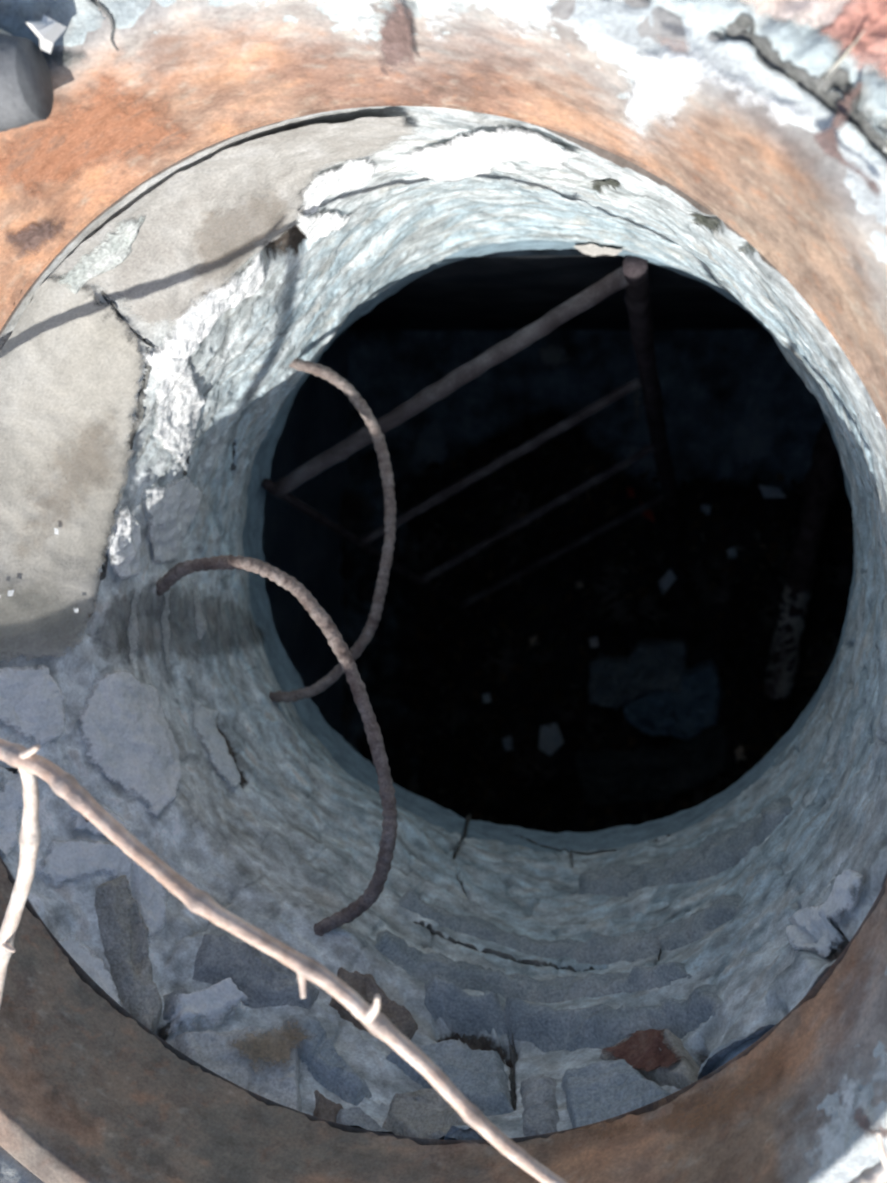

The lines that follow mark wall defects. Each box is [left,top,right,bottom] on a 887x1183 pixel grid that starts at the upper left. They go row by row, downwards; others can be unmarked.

crack [91,0,119,52]
corrosion [377,0,415,75]
spalling [39,47,85,67]
crack [718,14,887,159]
corrosion [814,82,881,196]
spalling [591,178,620,193]
corrosion [6,221,62,255]
spalling [266,225,306,257]
spalling [692,214,721,233]
spalling [437,1032,518,1068]
corrosion [602,1029,686,1072]
corrosion [854,1108,887,1138]